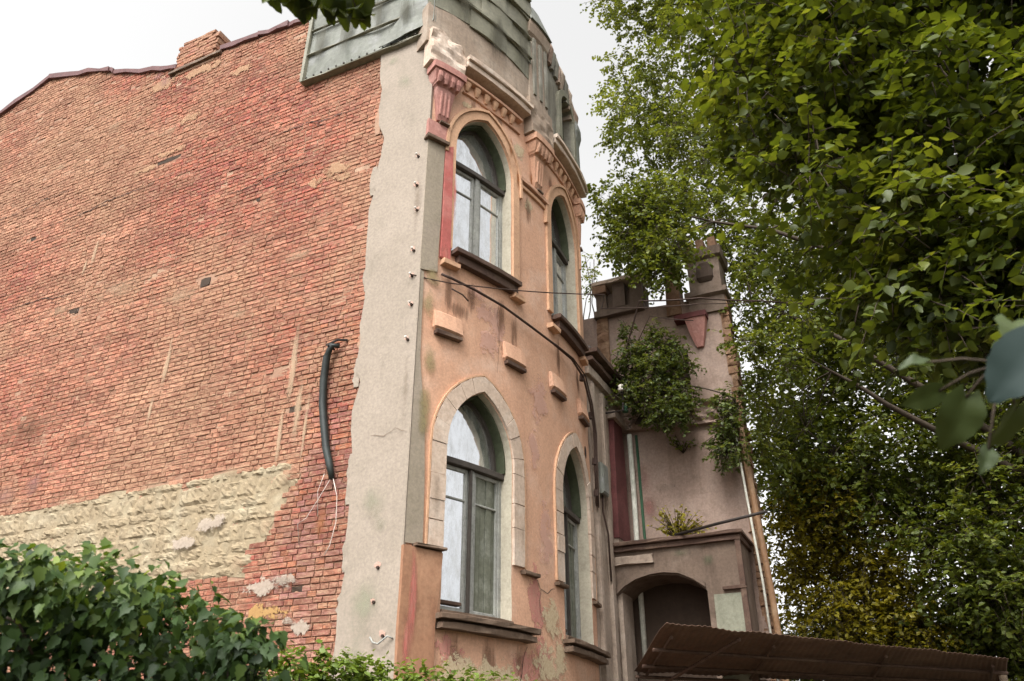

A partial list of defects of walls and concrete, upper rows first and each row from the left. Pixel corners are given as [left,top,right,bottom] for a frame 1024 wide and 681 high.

leakage [429,272,474,316]
leakage [499,306,516,345]
peeling [248,603,287,620]
flaking render [433,563,567,681]